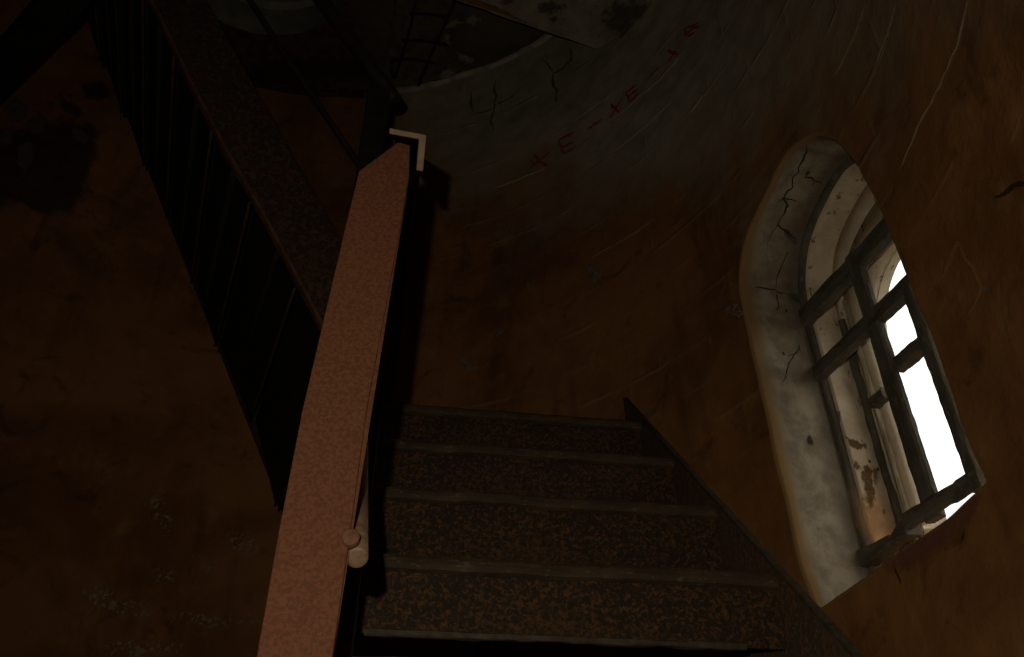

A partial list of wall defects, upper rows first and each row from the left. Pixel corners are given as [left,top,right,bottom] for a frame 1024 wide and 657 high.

crack [756,145,823,312]
peeling [846,437,879,507]